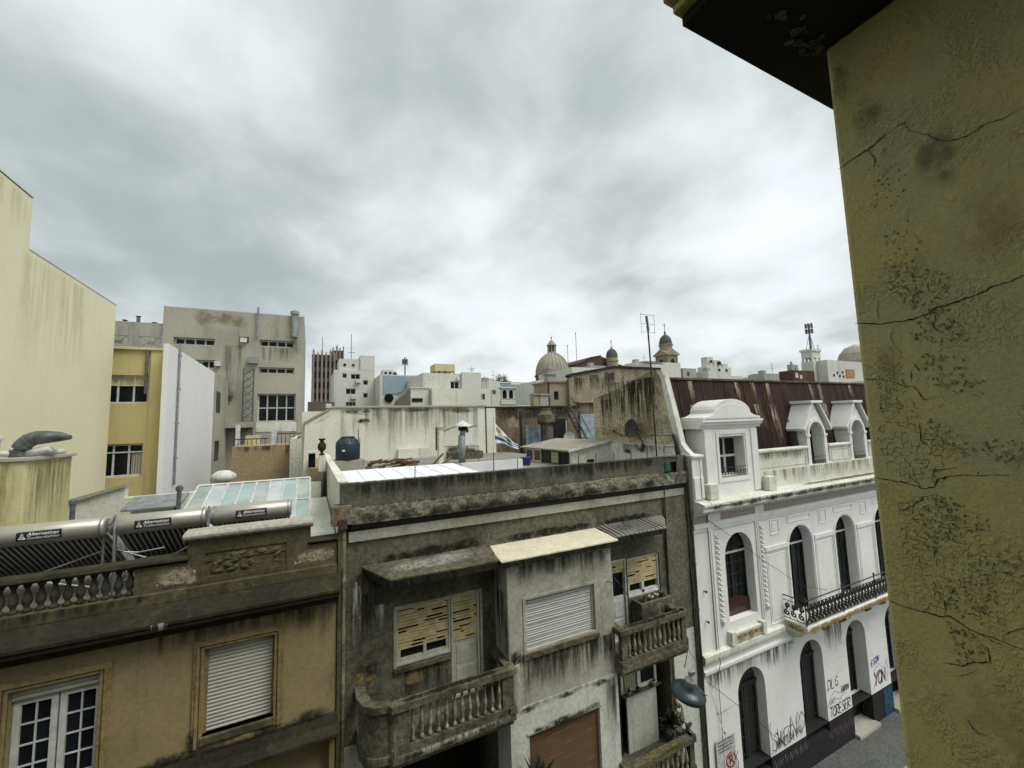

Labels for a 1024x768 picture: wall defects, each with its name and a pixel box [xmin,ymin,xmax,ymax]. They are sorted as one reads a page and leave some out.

crack [839,106,1024,169]
leakage [602,377,654,413]
leakage [398,480,654,518]
crack [855,275,1024,687]
rust [789,598,886,634]
leakage [513,633,615,679]